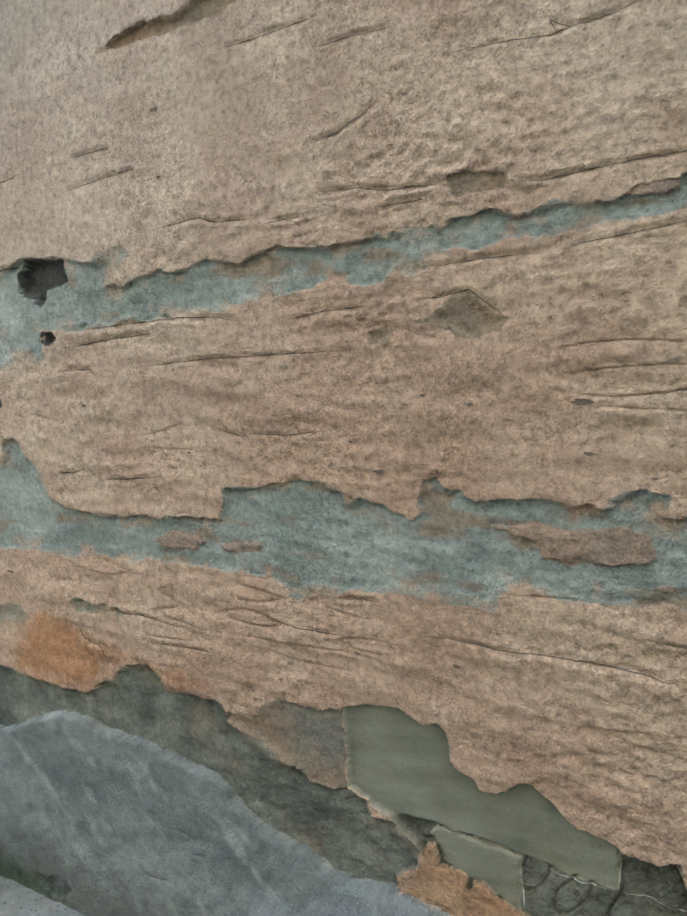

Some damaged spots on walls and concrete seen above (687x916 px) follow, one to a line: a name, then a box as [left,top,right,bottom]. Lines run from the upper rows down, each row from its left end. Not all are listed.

flaking render [95,0,237,54]
crack [218,15,317,49]
crack [317,27,388,47]
crack [437,0,639,56]
flaking render [0,169,687,370]
flaking render [0,437,687,612]
flaking render [0,602,28,623]
flaking render [70,597,125,618]
flaking render [0,664,687,916]